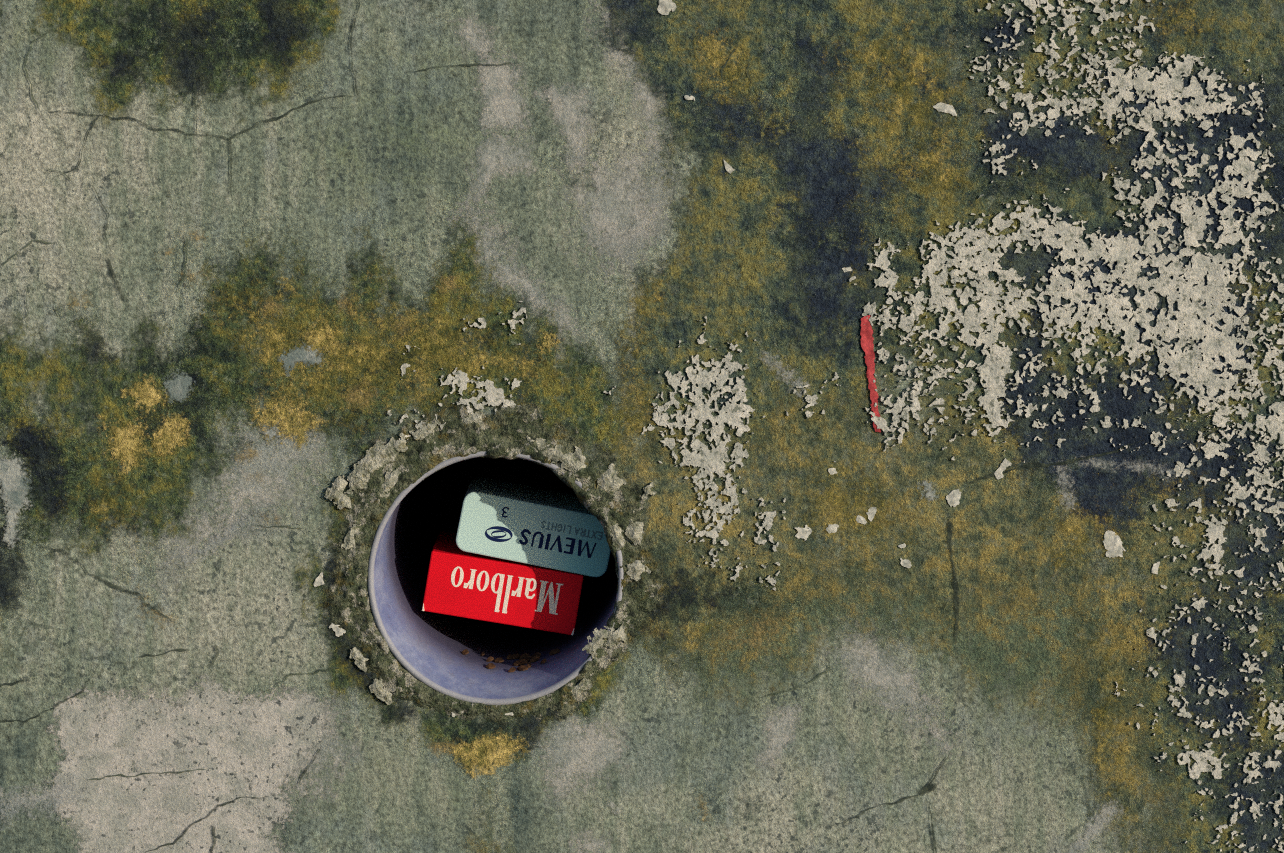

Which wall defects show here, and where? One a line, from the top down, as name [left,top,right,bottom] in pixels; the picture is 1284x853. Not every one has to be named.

crack [24,1,360,298]
crack [417,62,511,72]
water stain [561,0,681,282]
crack [0,240,53,272]
water stain [152,406,337,592]
peeling [641,316,841,590]
peeling [842,0,1284,853]
crack [0,663,100,723]
crack [89,769,204,780]
crack [145,797,259,853]